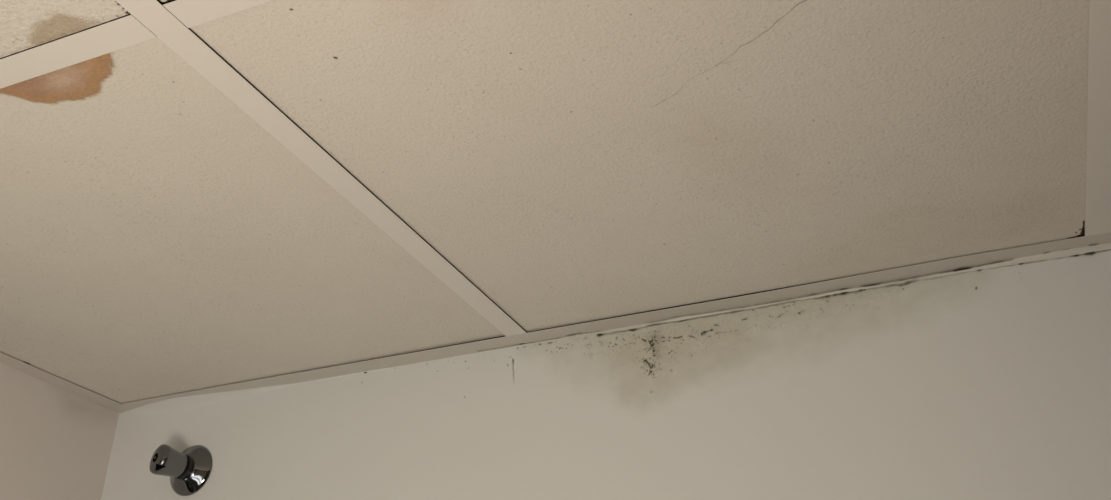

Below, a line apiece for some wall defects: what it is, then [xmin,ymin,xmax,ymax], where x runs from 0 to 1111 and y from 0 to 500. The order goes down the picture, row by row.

water stain [0,53,113,103]
crack [653,0,807,107]
water stain [597,278,913,378]